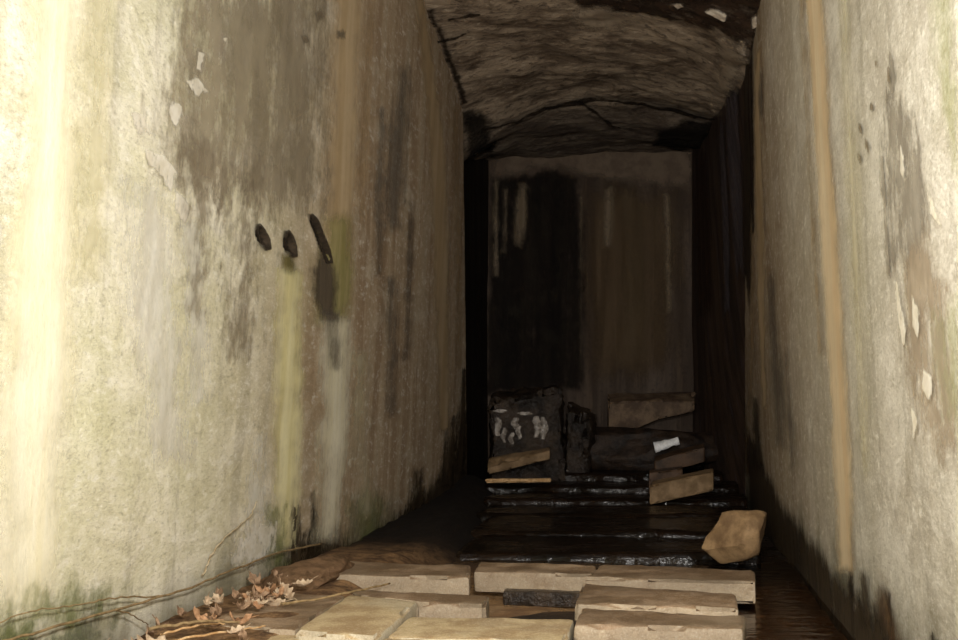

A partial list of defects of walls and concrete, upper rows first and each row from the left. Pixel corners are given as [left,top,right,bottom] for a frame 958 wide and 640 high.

water stain [128,0,328,458]
peeling [875,54,956,459]
water stain [744,401,897,640]